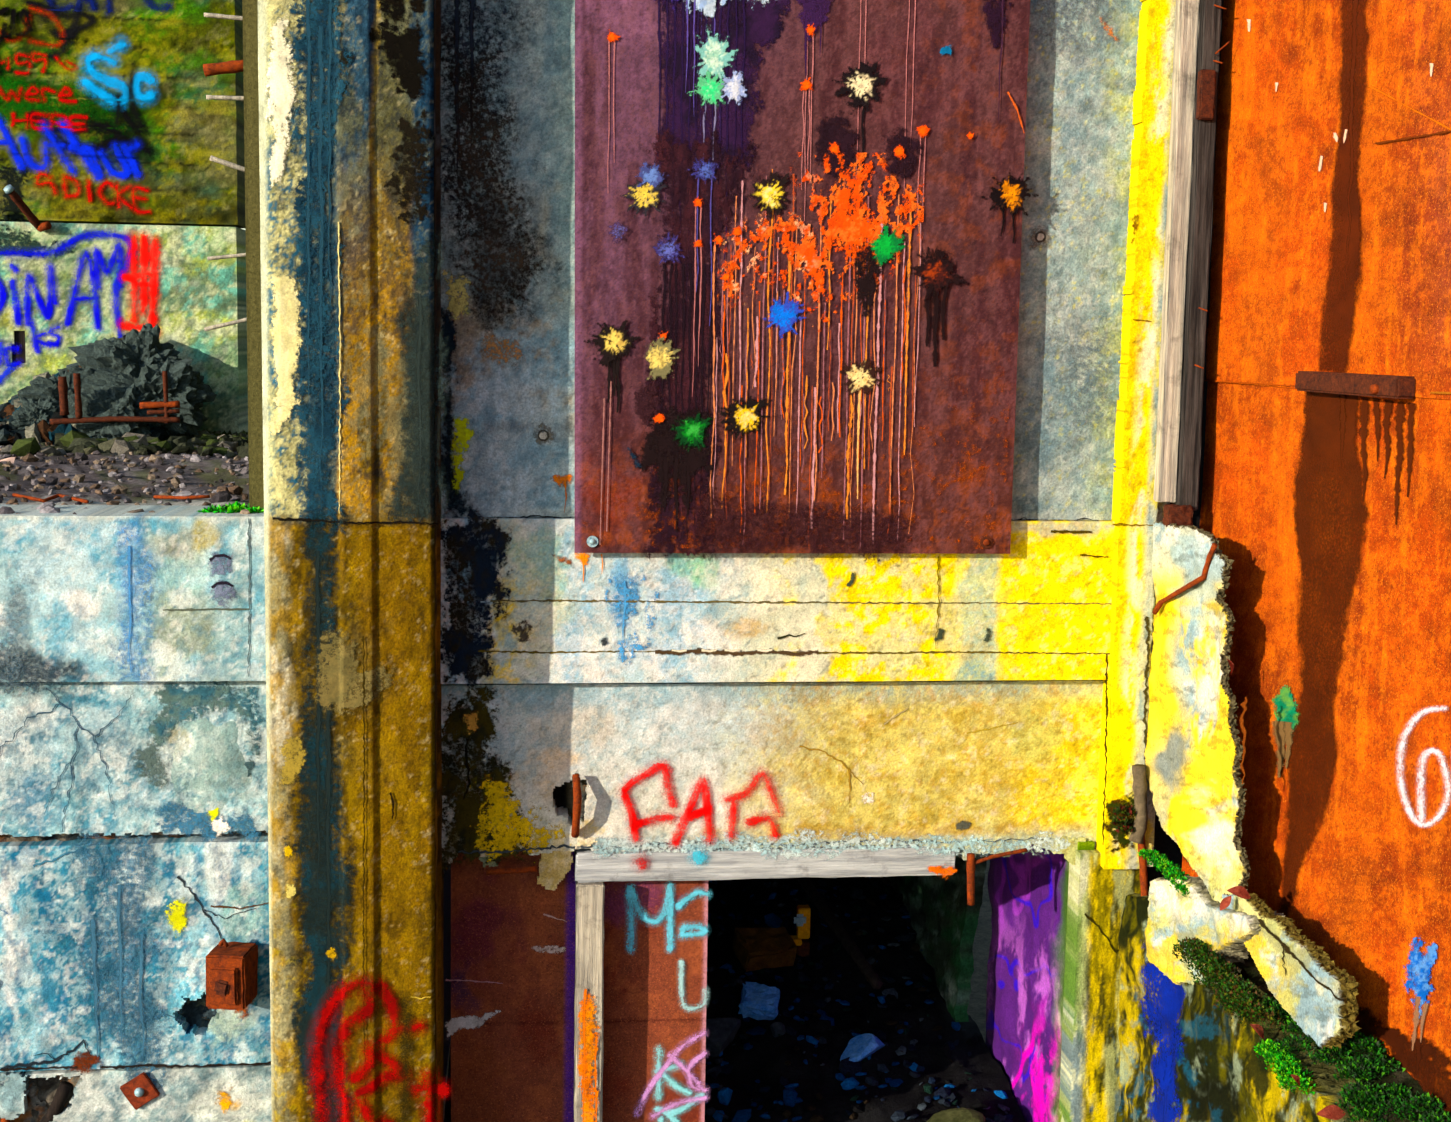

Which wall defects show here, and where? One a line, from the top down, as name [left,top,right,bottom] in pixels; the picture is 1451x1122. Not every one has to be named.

damp [0,158,76,258]
damp [276,0,357,1122]
damp [368,0,561,877]
rust [726,418,1006,549]
crack [0,688,134,867]
damp [47,522,266,1089]
spalling [0,1071,80,1122]
spalling [177,992,217,1028]
rust [451,849,708,1122]